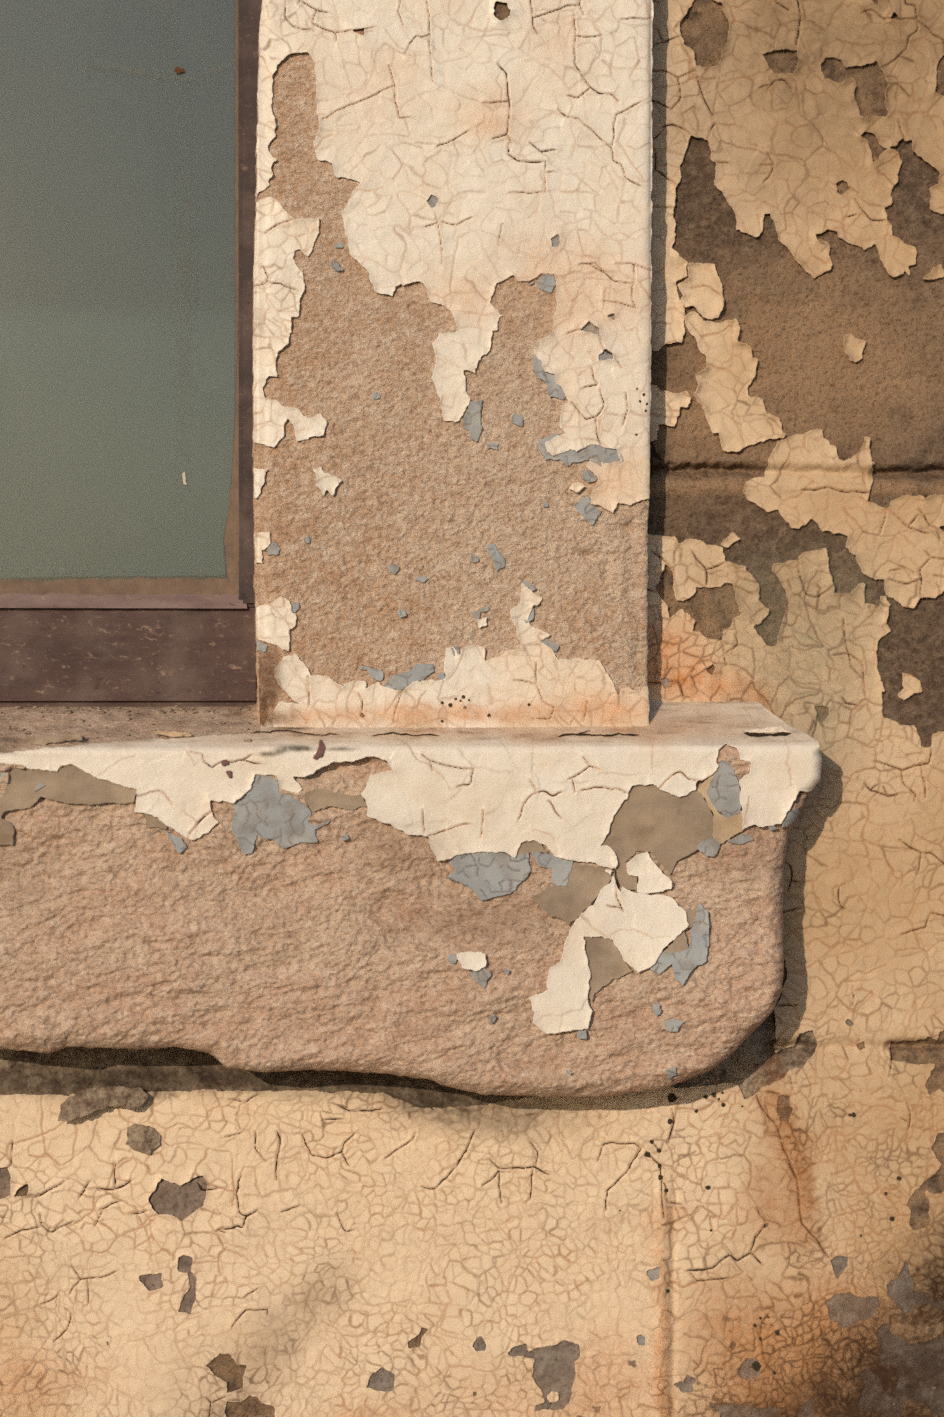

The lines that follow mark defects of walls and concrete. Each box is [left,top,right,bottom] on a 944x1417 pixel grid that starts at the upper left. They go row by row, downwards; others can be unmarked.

peeling [680,0,730,68]
crack [530,0,726,208]
peeling [0,49,944,1039]
crack [744,730,791,738]
peeling [148,1176,208,1221]
crack [197,1096,380,1233]
crack [423,1131,547,1203]
crack [598,1112,681,1216]
peeling [139,1255,197,1315]
damp [772,1257,944,1417]
peeling [206,1353,275,1417]
peeling [508,1340,601,1417]